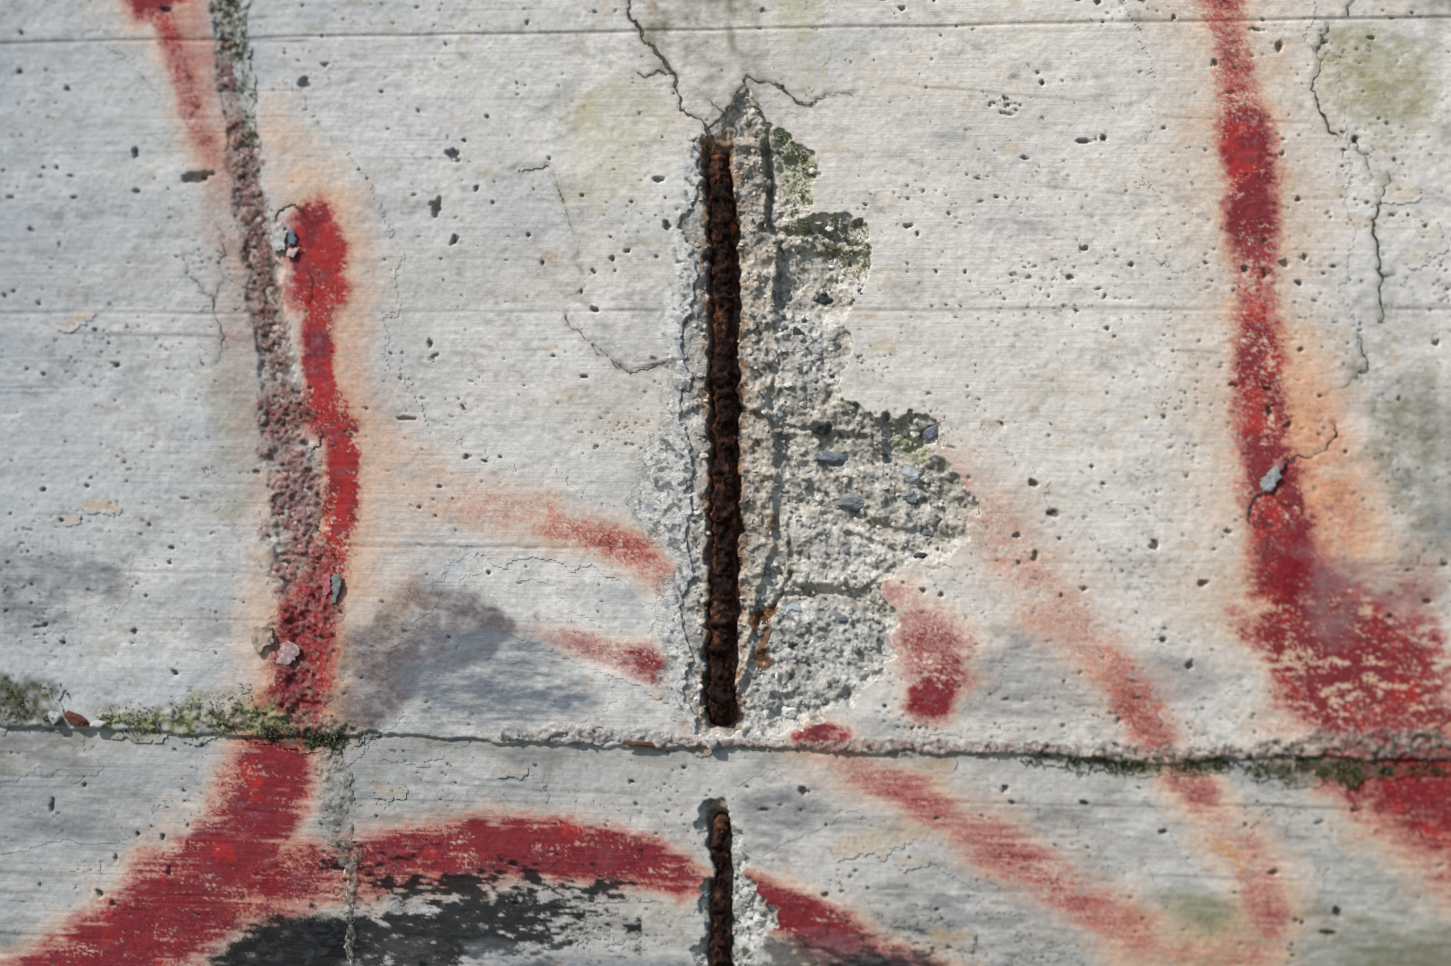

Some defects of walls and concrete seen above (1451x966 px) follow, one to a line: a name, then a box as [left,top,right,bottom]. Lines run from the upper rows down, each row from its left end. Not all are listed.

crack [627,0,852,138]
crack [1310,0,1396,388]
spalling [497,89,1451,764]
crack [1247,423,1338,585]
spalling [690,798,779,966]